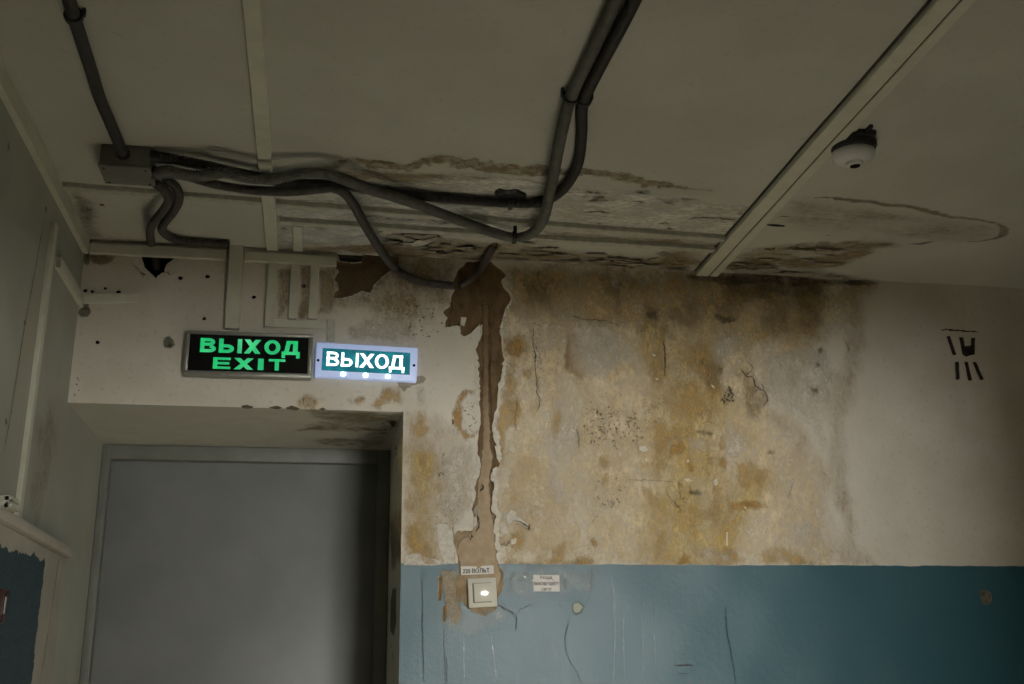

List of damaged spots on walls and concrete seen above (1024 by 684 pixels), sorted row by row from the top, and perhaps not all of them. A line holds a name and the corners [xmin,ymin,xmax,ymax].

damp [825,197,1008,245]
flaking render [131,257,180,278]
flaking render [334,231,445,298]
damp [278,156,892,566]
flaking render [438,261,523,629]
crack [725,605,736,683]